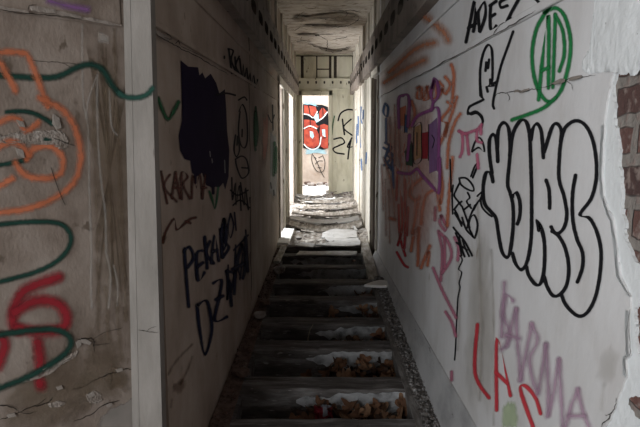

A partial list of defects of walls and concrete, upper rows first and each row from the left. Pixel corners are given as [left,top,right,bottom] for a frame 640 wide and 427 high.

flaking render [581,0,640,76]
crack [494,75,595,99]
spalling [0,114,74,158]
peeling [598,125,630,297]
crack [0,399,52,420]
spalling [628,396,640,419]